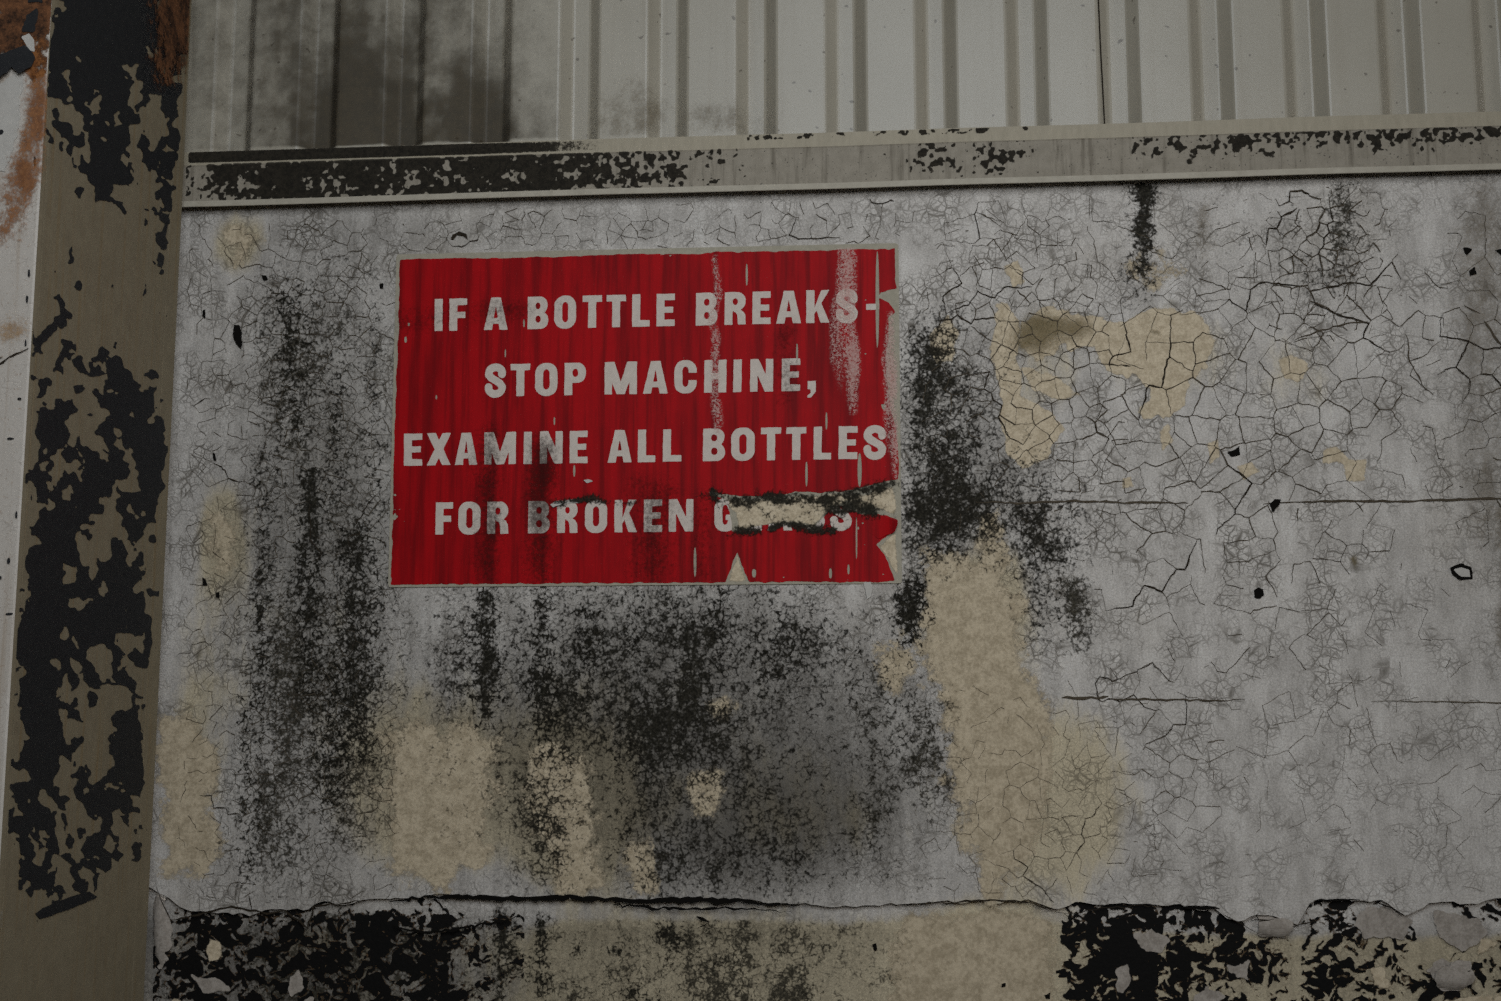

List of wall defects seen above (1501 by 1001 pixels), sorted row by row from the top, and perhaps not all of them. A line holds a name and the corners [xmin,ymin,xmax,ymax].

rust [0,0,52,237]
peeling [0,0,188,296]
damp [1121,181,1158,307]
peeling [990,247,1215,469]
peeling [0,280,228,922]
damp [219,273,1093,1001]
peeling [191,940,230,994]
peeling [288,970,304,997]
peeling [1115,965,1131,993]
peeling [1133,929,1170,953]
peeling [1227,960,1250,980]
flaking render [1371,967,1390,988]